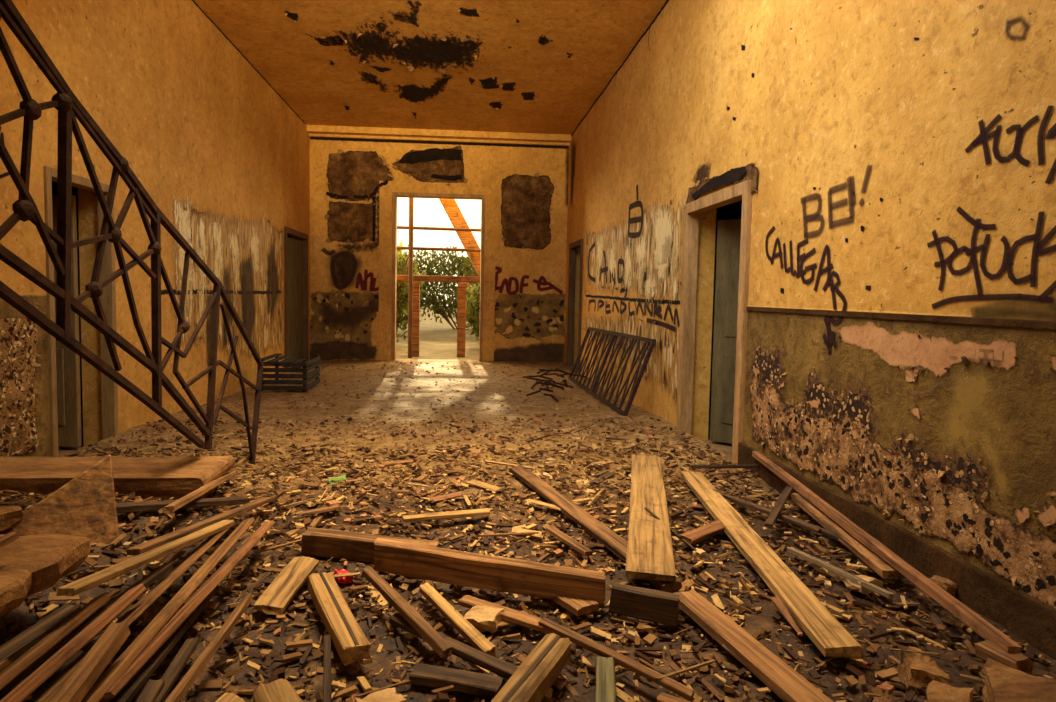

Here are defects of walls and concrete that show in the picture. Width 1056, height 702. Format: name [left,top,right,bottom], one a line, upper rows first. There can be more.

flaking render [305,0,535,119]
flaking render [324,146,468,252]
flaking render [500,172,554,250]
flaking render [0,316,43,457]
peeling [310,290,379,360]
peeling [837,321,1017,383]
flaking render [750,364,1056,609]